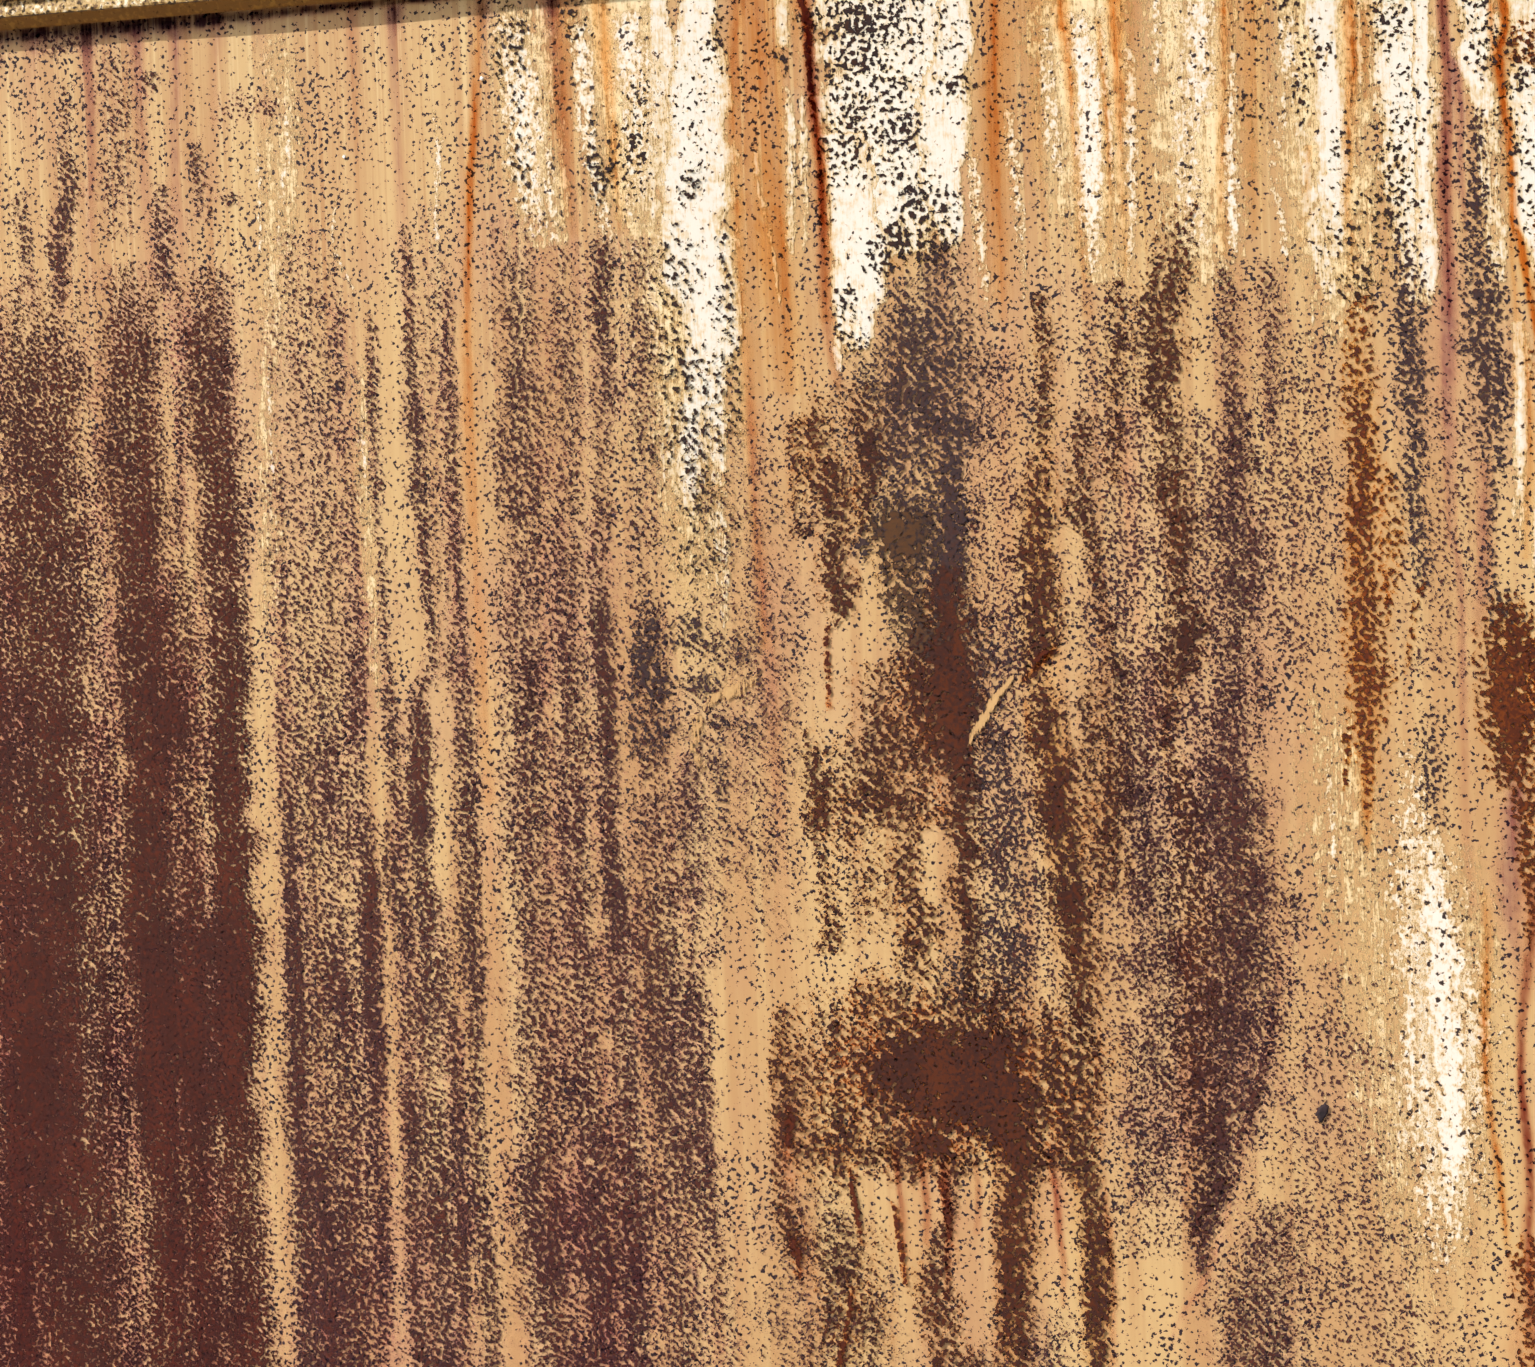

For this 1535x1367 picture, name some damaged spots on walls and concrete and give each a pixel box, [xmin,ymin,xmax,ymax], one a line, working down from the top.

rust [488,0,534,188]
rust [550,0,593,50]
rust [581,0,728,221]
rust [769,40,792,77]
rust [1236,87,1269,129]
rust [1272,0,1333,127]
rust [1328,110,1357,199]
rust [1362,0,1420,63]
rust [1445,0,1535,100]
rust [1495,124,1535,179]
rust [1513,184,1535,234]
rust [1506,1234,1535,1367]